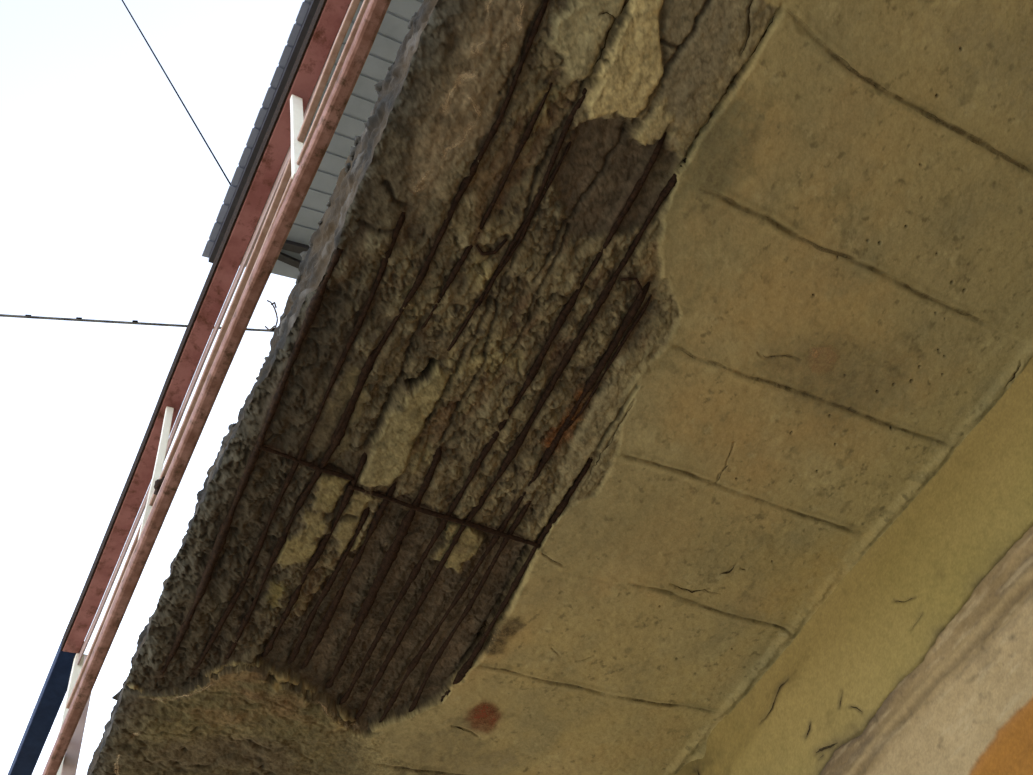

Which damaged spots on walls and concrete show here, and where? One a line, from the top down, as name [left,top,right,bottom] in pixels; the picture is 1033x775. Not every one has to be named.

spalling [126,0,779,732]
corrosion [469,703,499,731]
crack [807,724,837,758]